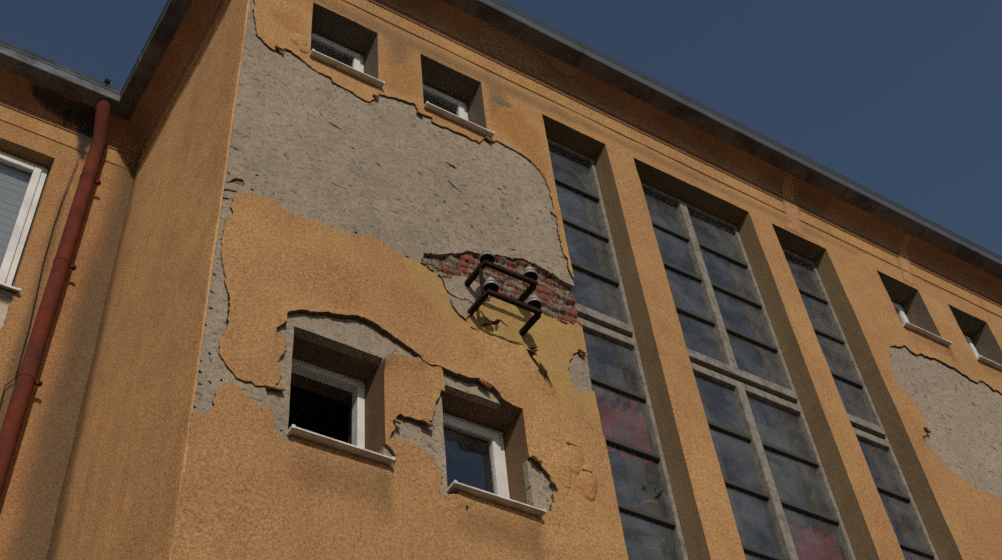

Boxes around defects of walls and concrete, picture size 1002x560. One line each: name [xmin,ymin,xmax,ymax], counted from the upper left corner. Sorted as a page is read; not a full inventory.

water stain [32,85,96,158]
flaking render [193,0,603,442]
flaking render [0,297,11,329]
flaking render [889,346,1002,501]